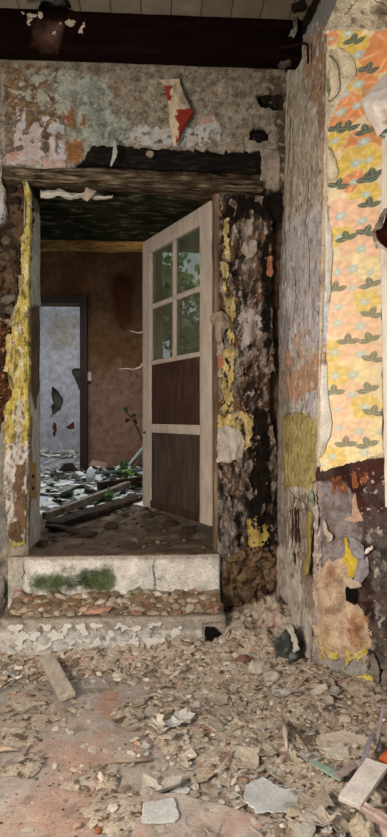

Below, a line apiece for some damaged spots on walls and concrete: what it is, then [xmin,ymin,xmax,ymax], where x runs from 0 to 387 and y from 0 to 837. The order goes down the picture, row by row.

peeling [52,19,85,36]
peeling [5,69,69,169]
peeling [130,114,222,148]
spalling [257,94,284,111]
peeling [255,148,280,204]
leakage [225,407,278,554]
peeling [0,183,387,837]